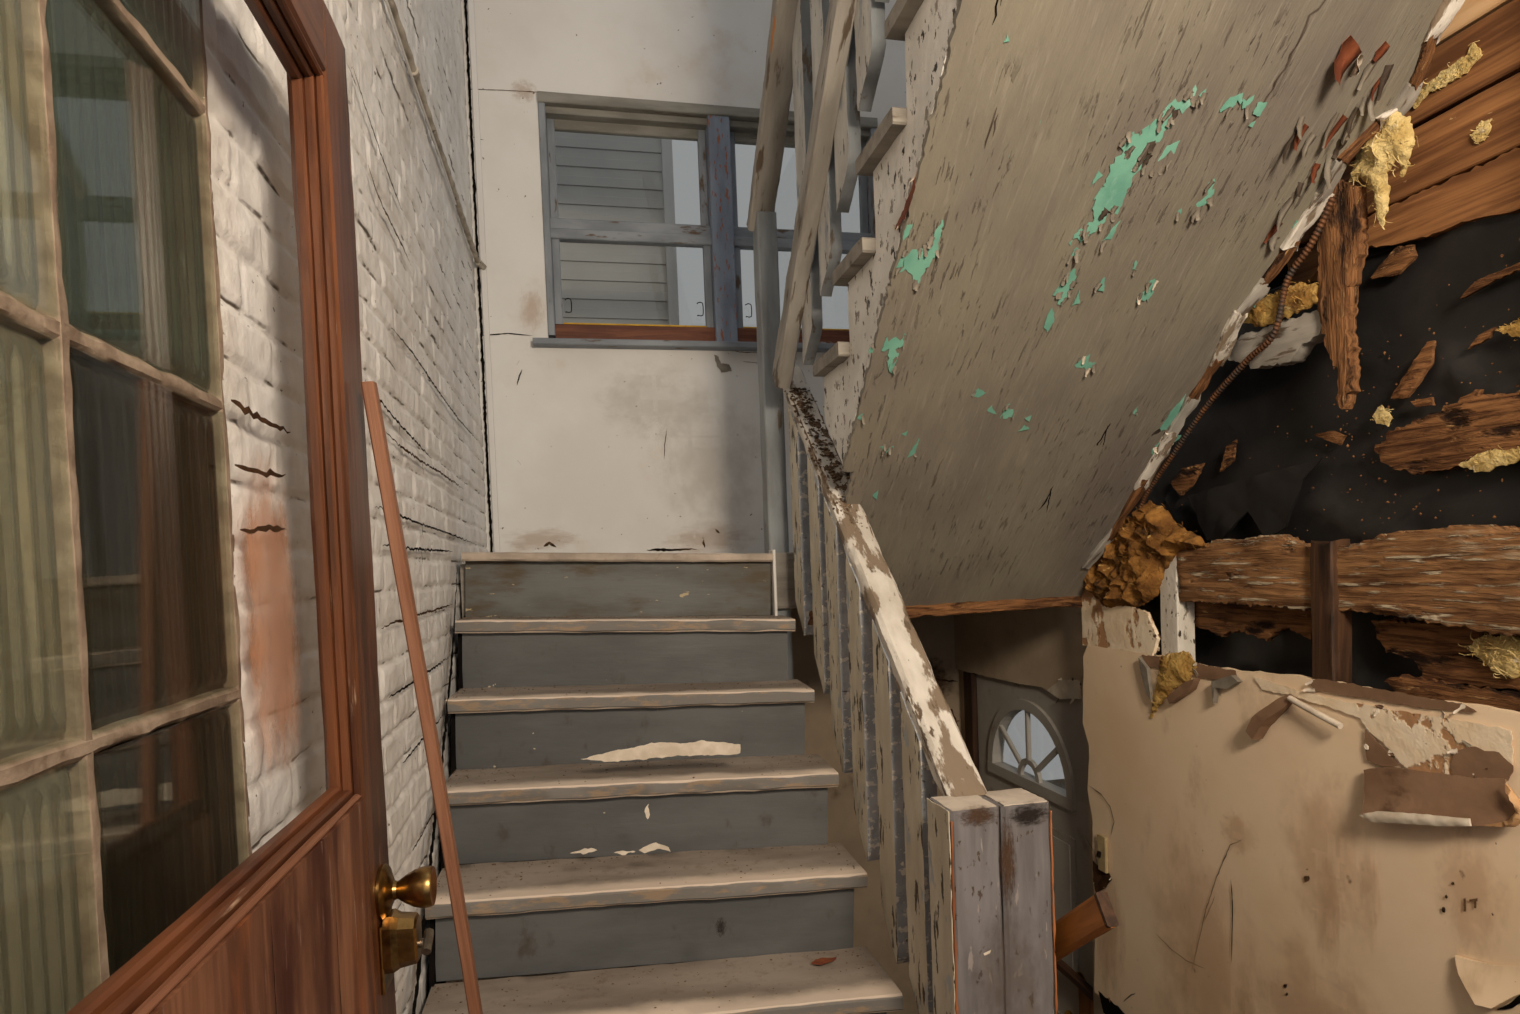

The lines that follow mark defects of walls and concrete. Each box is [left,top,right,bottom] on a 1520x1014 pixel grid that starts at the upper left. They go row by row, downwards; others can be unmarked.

peeling [1264,35,1394,251]
peeling [1044,84,1267,332]
peeling [893,176,944,291]
peeling [869,334,907,378]
crack [231,399,290,434]
crack [235,464,286,478]
crack [240,524,285,534]
leakage [249,497,294,754]
peeling [583,740,741,762]
flaking render [1093,861,1112,892]
flaking render [1099,992,1124,1014]
flaking render [1455,955,1520,1008]